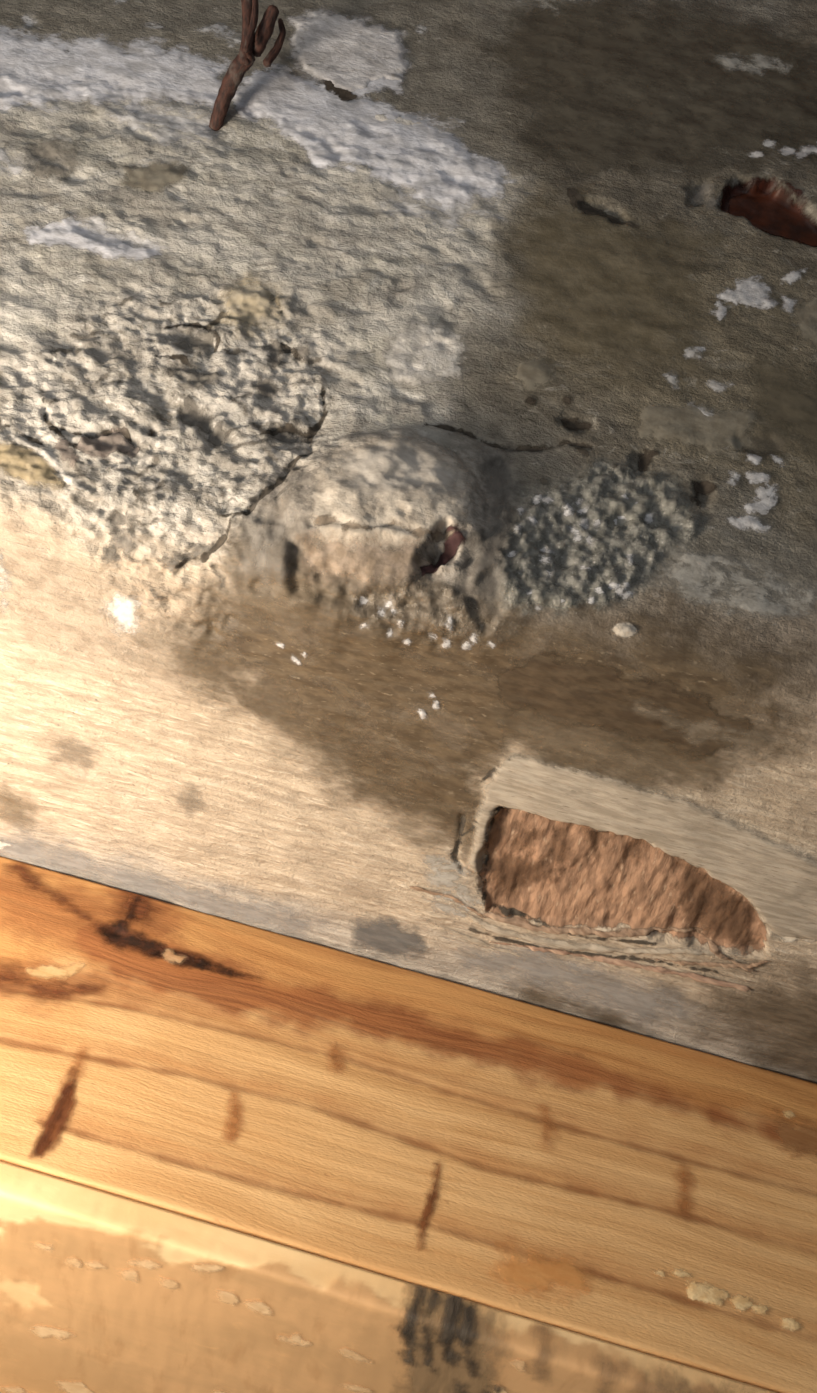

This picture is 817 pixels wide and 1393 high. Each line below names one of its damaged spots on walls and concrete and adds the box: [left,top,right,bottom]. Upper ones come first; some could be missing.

efflorescence [23,212,165,260]
efflorescence [0,27,512,231]
leakage [523,210,699,369]
leakage [500,0,817,172]
rust [722,177,805,213]
crack [0,289,328,599]
leakage [178,540,808,842]